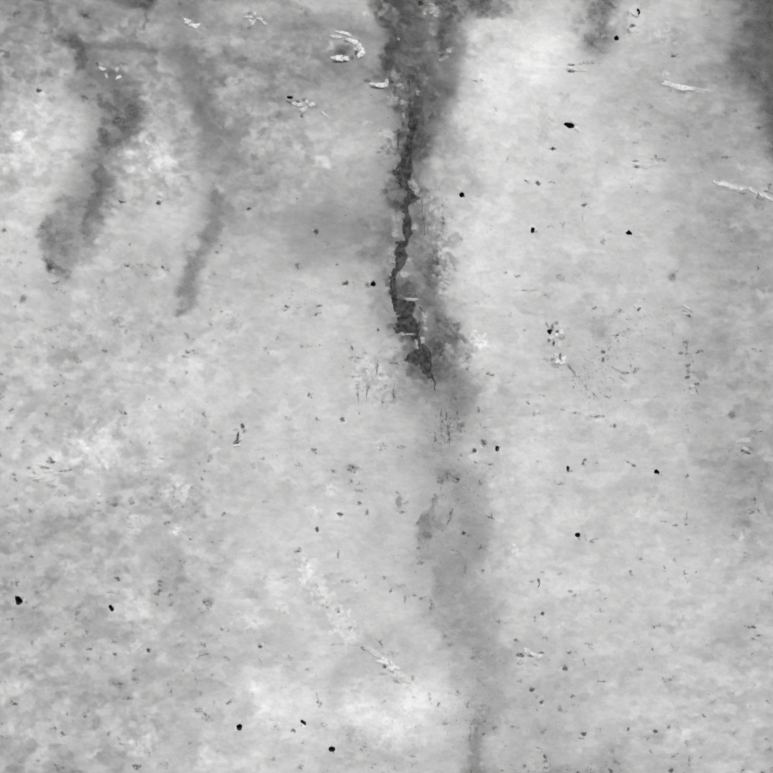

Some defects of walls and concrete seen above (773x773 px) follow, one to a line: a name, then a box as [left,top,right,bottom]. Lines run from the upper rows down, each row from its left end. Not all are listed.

crack [389,72,450,390]